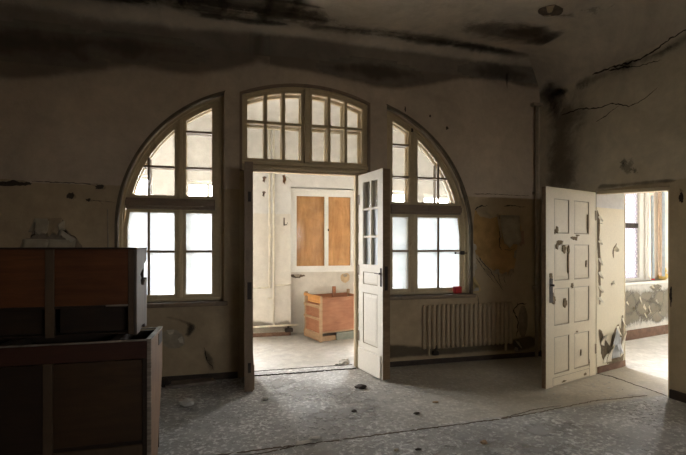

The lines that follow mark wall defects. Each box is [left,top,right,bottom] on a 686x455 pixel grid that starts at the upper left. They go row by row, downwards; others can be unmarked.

leakage [168,0,327,24]
leakage [471,23,549,43]
crack [593,29,686,75]
crack [573,88,657,122]
peeling [626,284,672,321]
peeling [599,315,627,364]
crack [217,373,666,455]